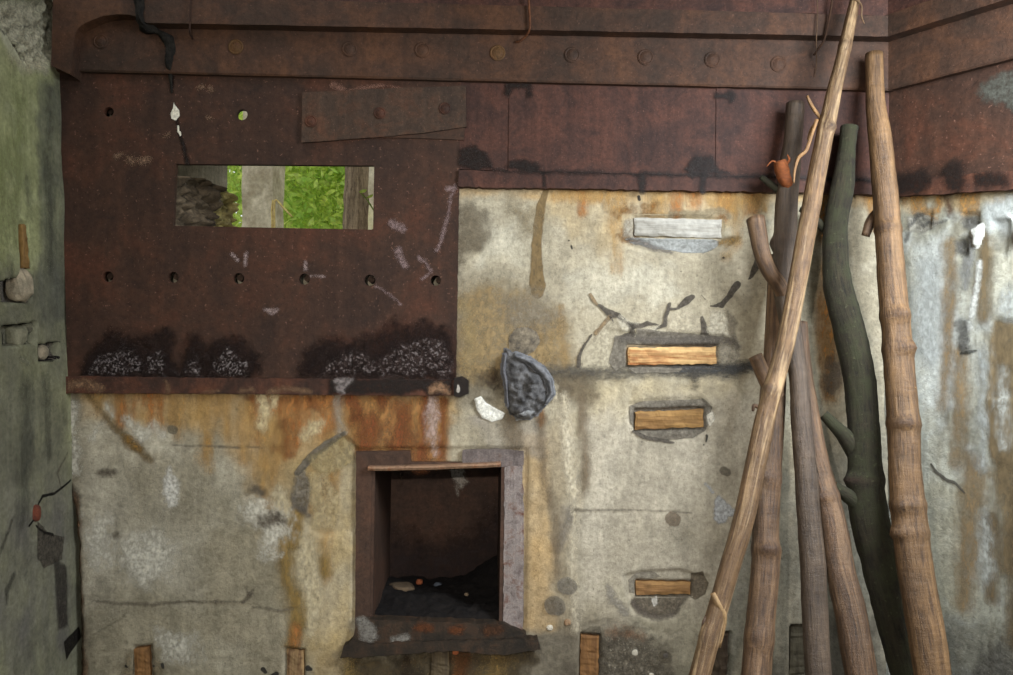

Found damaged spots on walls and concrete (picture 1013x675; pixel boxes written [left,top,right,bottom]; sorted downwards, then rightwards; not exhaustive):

rust [819,195,828,221]
rust [68,327,261,393]
rust [240,320,455,500]
crack [577,261,759,368]
rust [818,298,842,399]
leakage [916,198,1013,646]